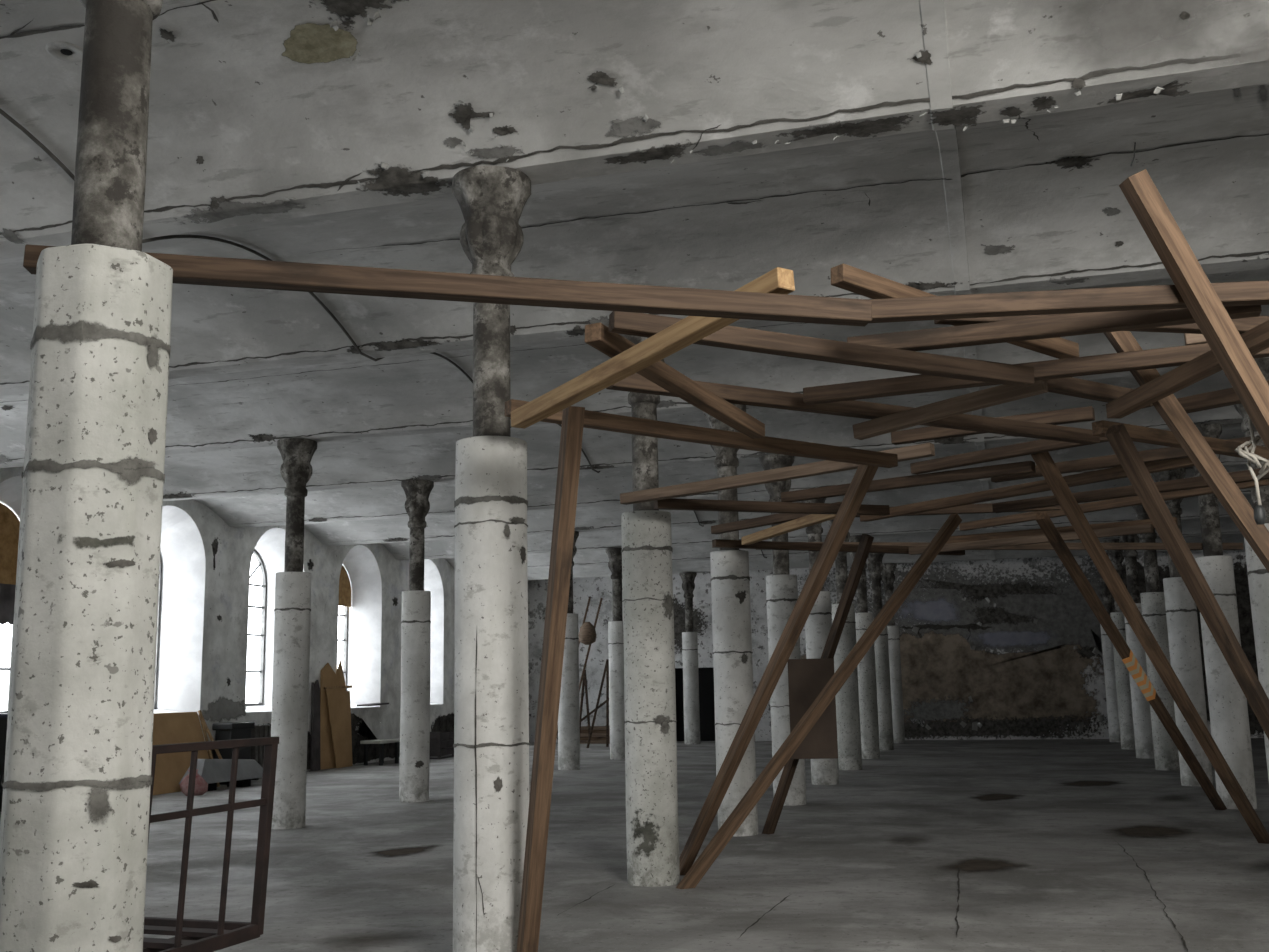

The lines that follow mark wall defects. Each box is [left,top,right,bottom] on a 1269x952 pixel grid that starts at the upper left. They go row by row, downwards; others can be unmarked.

peeling [282,0,408,64]
crack [411,55,1232,229]
peeling [604,96,1059,165]
crack [1084,134,1269,159]
crack [144,172,377,212]
crack [0,220,72,235]
crack [309,239,460,254]
water stain [1110,825,1189,837]
crack [1112,838,1188,952]